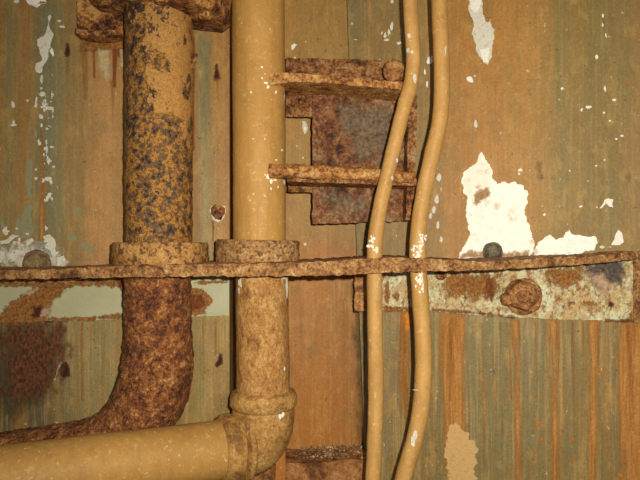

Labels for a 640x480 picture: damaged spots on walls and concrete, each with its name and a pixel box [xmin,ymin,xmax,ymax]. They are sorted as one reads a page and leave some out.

peeling [26,15,65,168]
rust [80,41,124,88]
peeling [468,0,495,65]
peeling [0,159,53,263]
peeling [43,226,66,266]
rust [443,270,501,302]
peeling [459,152,624,259]
rust [545,266,585,288]
rust [432,308,471,447]
rust [479,312,521,480]
rust [588,312,640,480]
peeling [444,422,478,480]